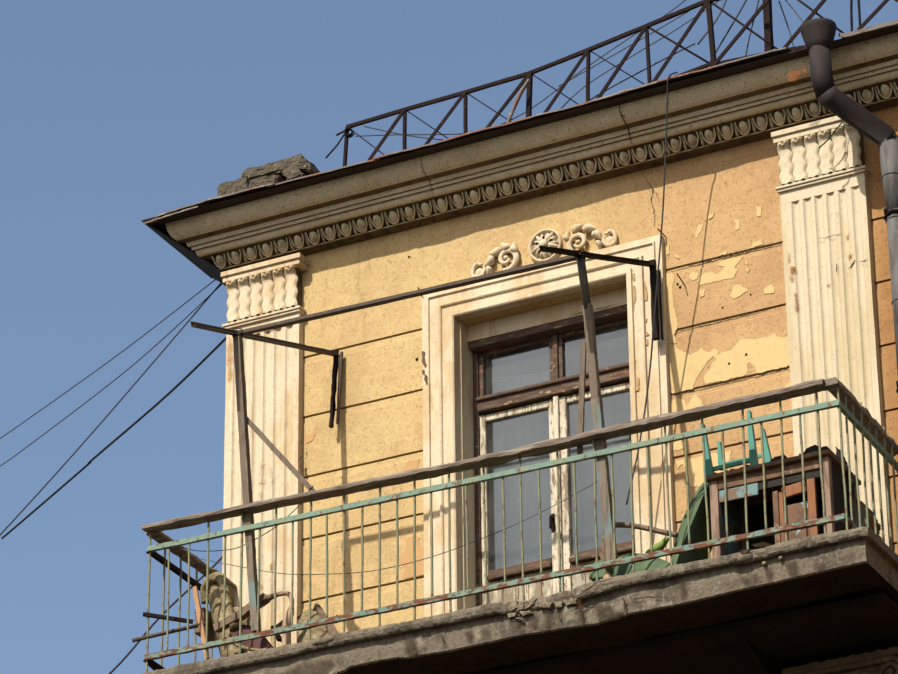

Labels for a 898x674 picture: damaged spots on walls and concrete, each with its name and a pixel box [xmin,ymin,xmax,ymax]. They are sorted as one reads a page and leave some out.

peeling [689,252,751,299]
peeling [665,272,789,412]
spalling [507,597,578,621]